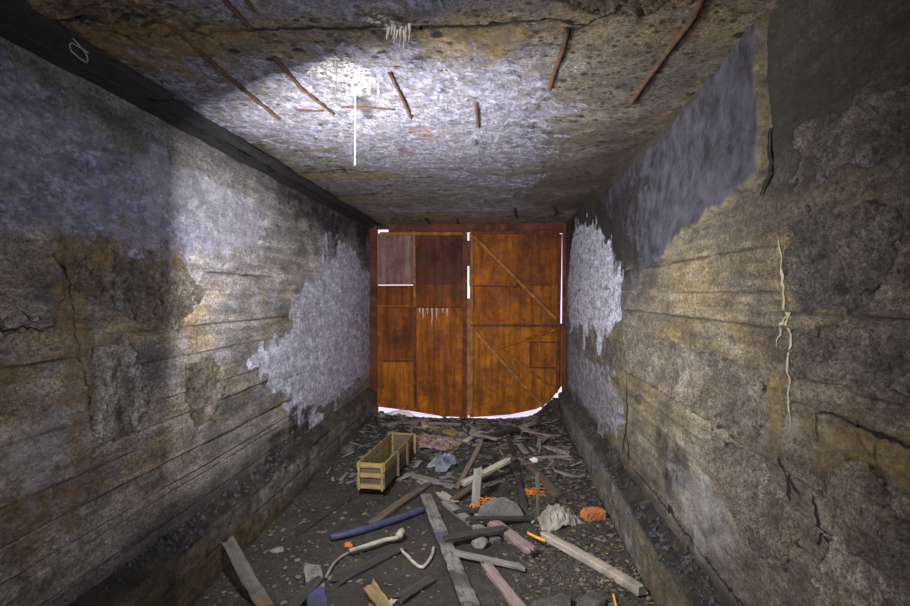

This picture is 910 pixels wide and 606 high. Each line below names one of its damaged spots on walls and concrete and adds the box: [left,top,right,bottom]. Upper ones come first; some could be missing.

peeling [25,0,586,188]
crack [56,0,627,40]
leakage [307,56,380,146]
leakage [364,13,424,69]
spalling [569,0,706,107]
flaking render [603,16,773,266]
spalling [789,82,910,192]
leakage [572,160,657,275]
leakage [265,406,312,459]